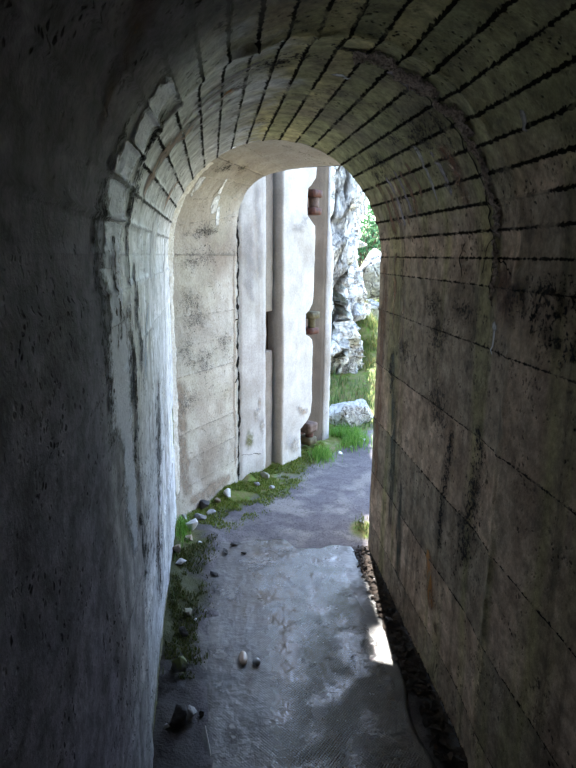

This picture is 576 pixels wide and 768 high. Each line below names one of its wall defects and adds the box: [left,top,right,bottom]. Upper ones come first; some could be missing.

crack [411,87,511,299]
damp [150,162,246,567]
damp [389,351,402,579]
damp [437,423,454,552]
damp [455,426,484,569]